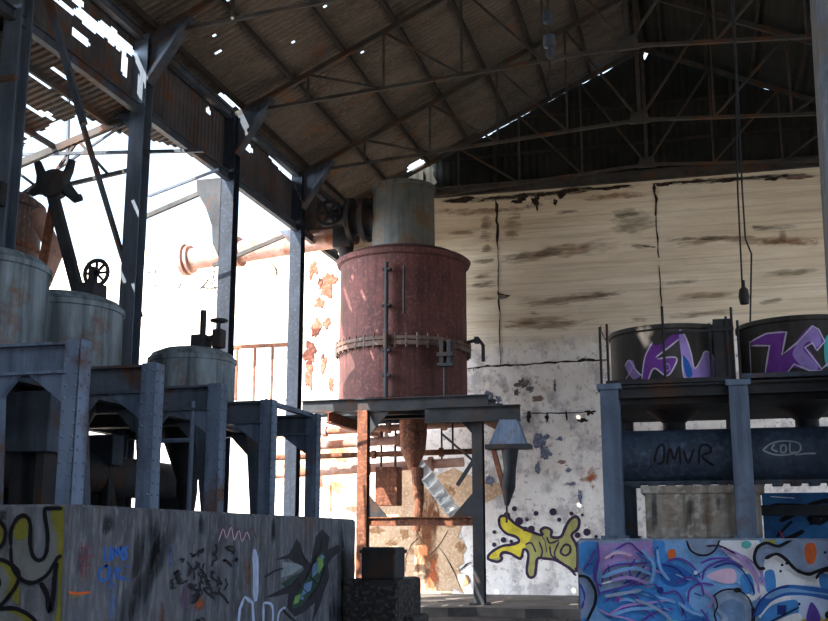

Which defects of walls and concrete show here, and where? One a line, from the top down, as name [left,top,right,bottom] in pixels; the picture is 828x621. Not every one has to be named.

crack [642,184,662,306]
peeling [303,259,339,392]
flaking render [513,377,556,402]
peeling [369,468,472,594]
corrosion [415,493,439,588]
peeling [485,475,502,503]
flaking render [533,433,572,474]